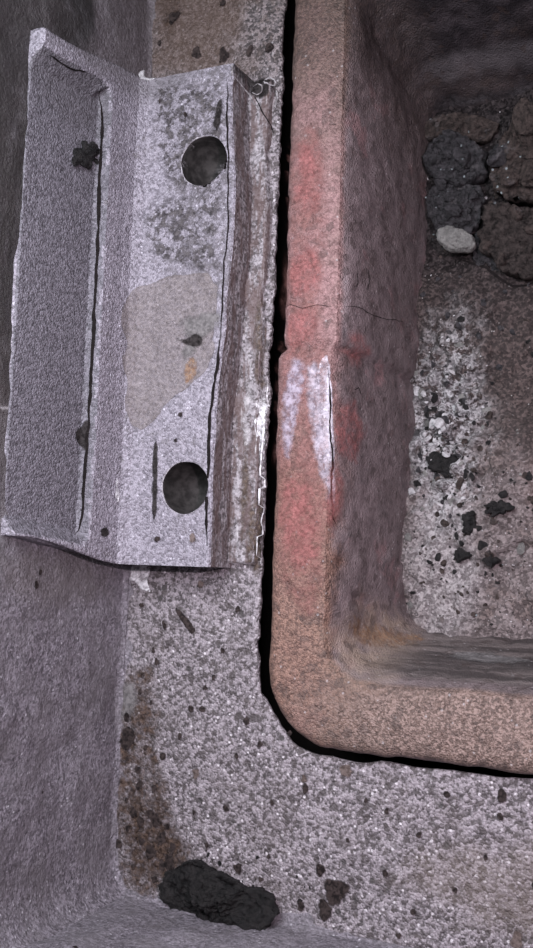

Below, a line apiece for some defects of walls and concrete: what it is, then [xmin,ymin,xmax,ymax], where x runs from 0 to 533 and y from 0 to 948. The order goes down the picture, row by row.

crack [280,274,403,322]
crack [328,373,337,525]